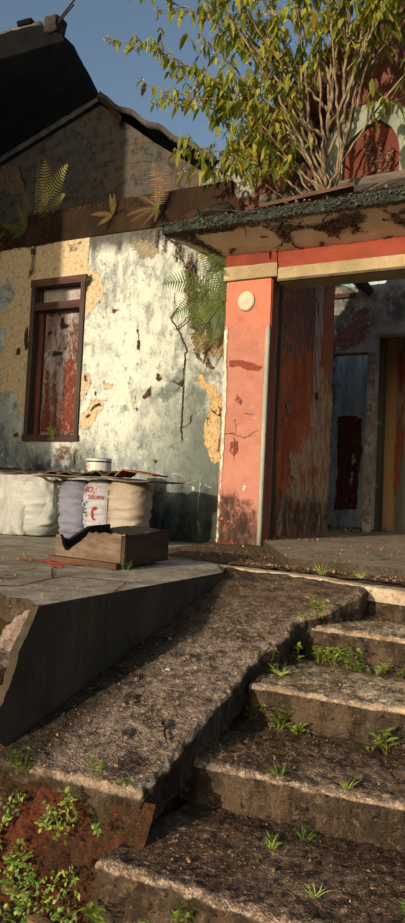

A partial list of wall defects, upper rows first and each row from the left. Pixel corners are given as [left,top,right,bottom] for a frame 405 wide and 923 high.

peeling [0,237,113,434]
spalling [131,373,162,412]
peeling [196,325,262,543]
leakage [164,199,405,301]
peeling [276,366,333,537]
peeling [333,297,374,352]